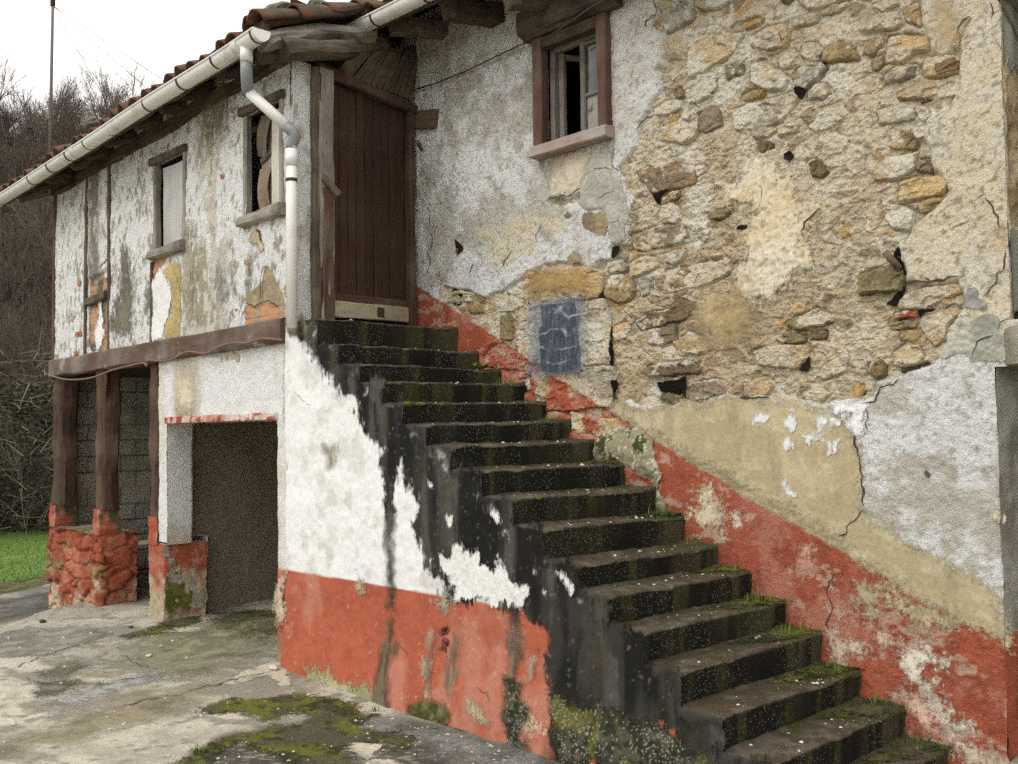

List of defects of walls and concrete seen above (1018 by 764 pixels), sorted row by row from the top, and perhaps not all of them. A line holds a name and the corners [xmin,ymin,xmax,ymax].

crack [956,1,994,48]
spalling [794,87,806,99]
spalling [652,189,667,205]
flaking render [75,276,107,351]
peeling [153,258,182,338]
peeling [235,265,286,325]
spalling [882,247,907,307]
water stain [383,509,395,608]
peeling [609,376,1013,764]
crack [825,573,837,630]
water stain [372,620,398,708]
water stain [506,601,534,679]